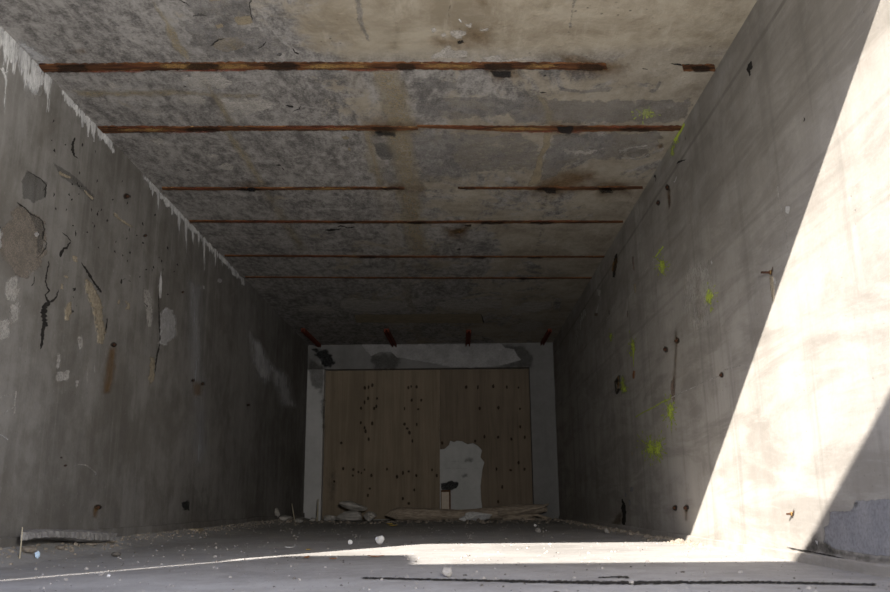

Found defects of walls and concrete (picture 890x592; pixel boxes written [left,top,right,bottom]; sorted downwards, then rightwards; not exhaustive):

efflorescence [0,26,52,112]
corrosion [179,63,245,72]
corrosion [263,63,297,71]
corrosion [348,63,416,71]
corrosion [484,63,513,78]
efflorescence [62,91,114,154]
corrosion [372,121,417,136]
corrosion [509,126,582,134]
corrosion [599,183,625,194]
spalling [0,202,47,340]
crack [31,230,131,349]
peeling [56,354,79,387]